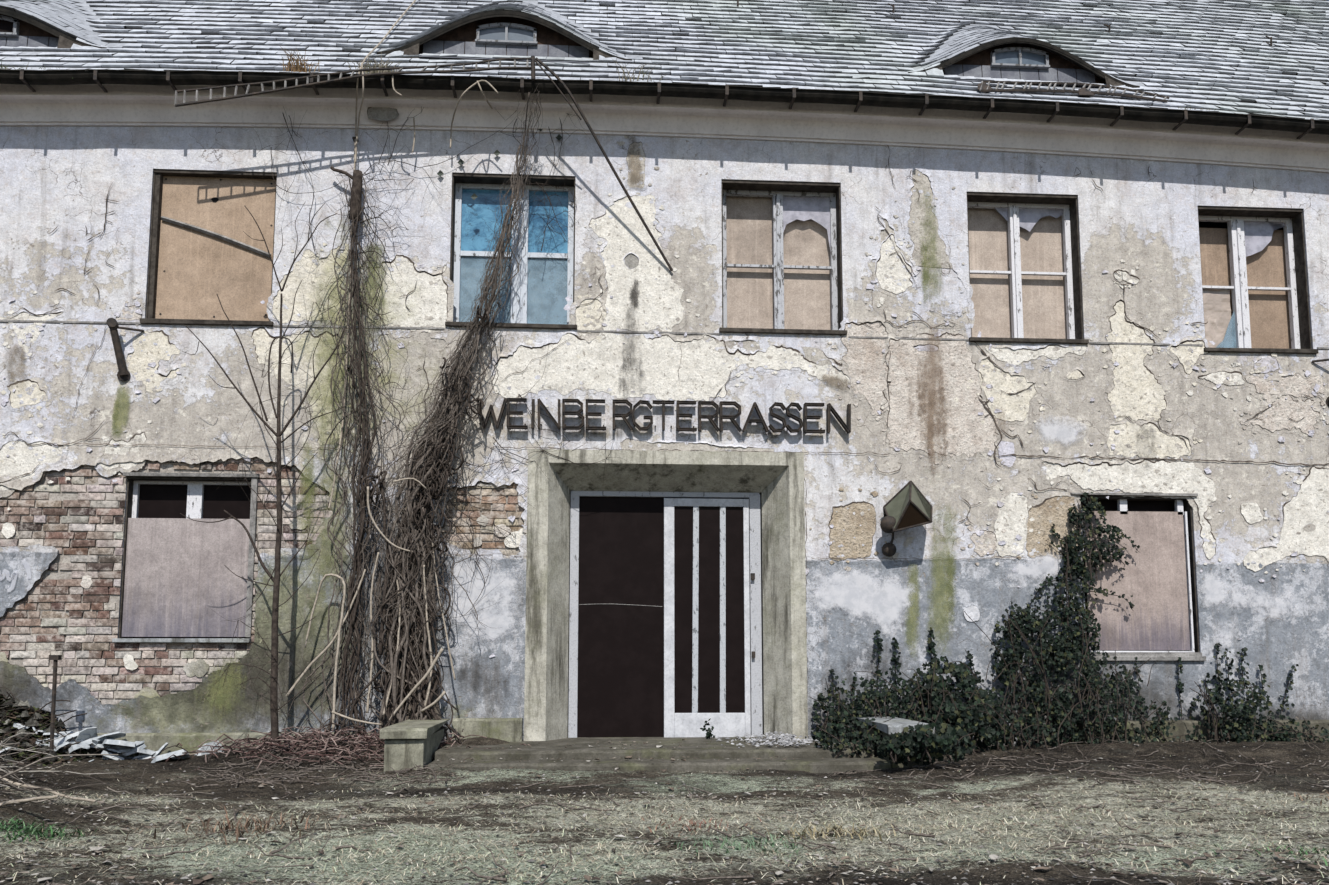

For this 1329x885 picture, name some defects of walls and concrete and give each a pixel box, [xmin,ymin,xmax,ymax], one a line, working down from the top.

flaking render [481,136,1329,578]
crack [491,145,1329,693]
spalling [0,240,460,717]
spalling [433,466,528,568]
water stain [806,568,913,634]
water stain [1008,555,1069,588]
water stain [1214,624,1242,647]
water stain [1200,567,1299,618]